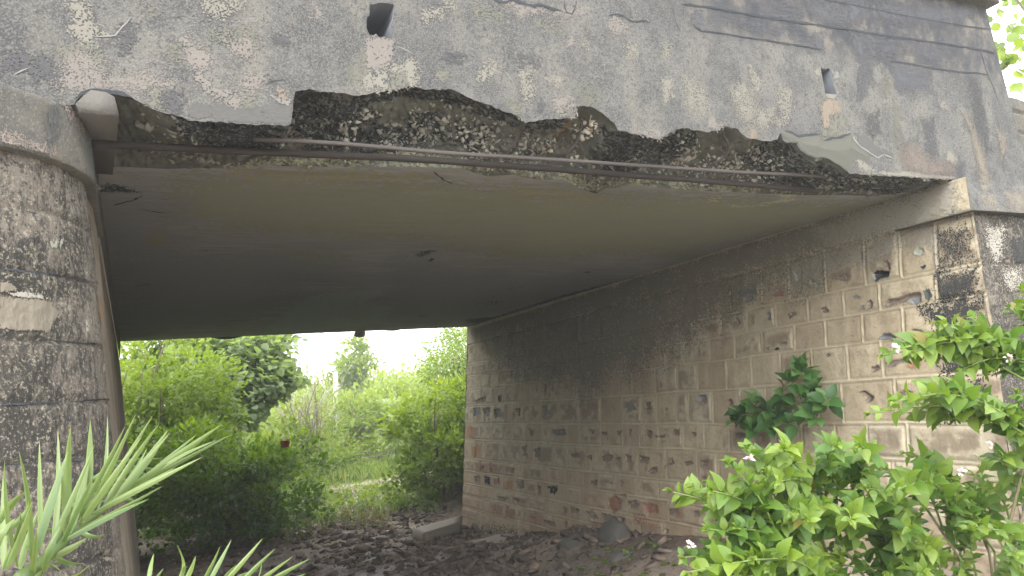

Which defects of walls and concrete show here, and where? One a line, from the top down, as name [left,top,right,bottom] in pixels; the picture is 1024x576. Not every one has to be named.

spalling [98,86,955,200]
damp [100,0,1024,408]
spalling [0,281,59,333]